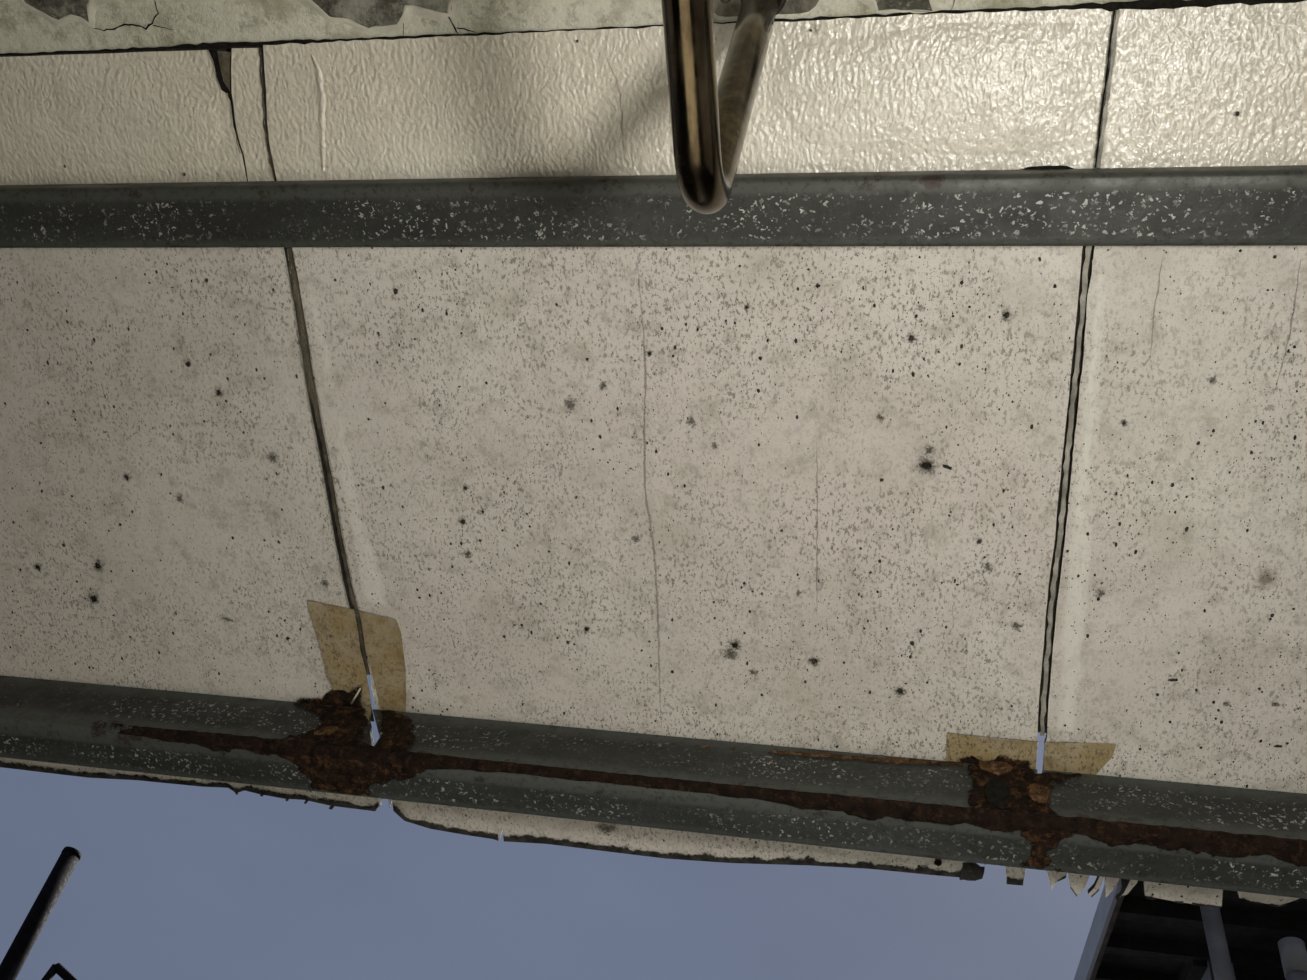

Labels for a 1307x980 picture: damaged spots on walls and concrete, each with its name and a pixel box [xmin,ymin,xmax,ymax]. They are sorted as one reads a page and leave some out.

peeling [17,0,124,30]
peeling [296,0,461,36]
peeling [859,0,941,15]
rust [96,685,1307,872]